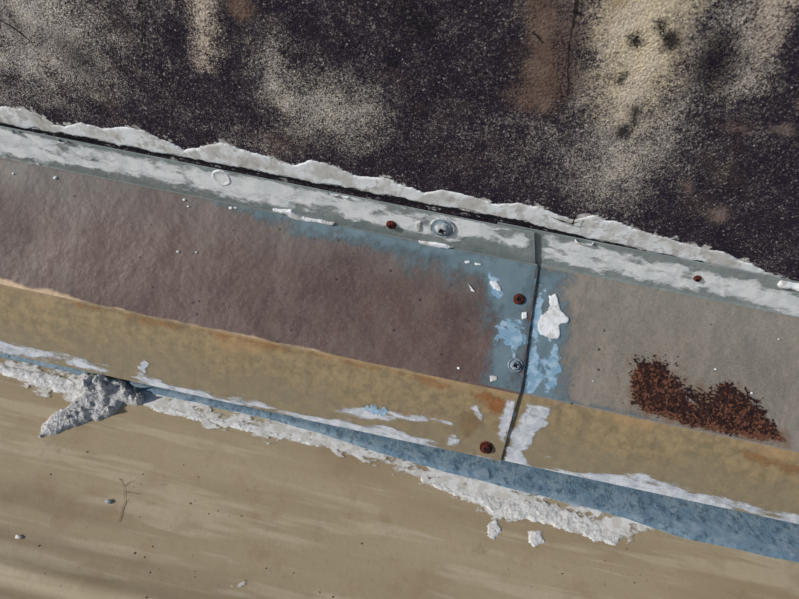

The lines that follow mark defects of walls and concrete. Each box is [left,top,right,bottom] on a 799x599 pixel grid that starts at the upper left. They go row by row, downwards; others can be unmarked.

rust [623,354,786,443]